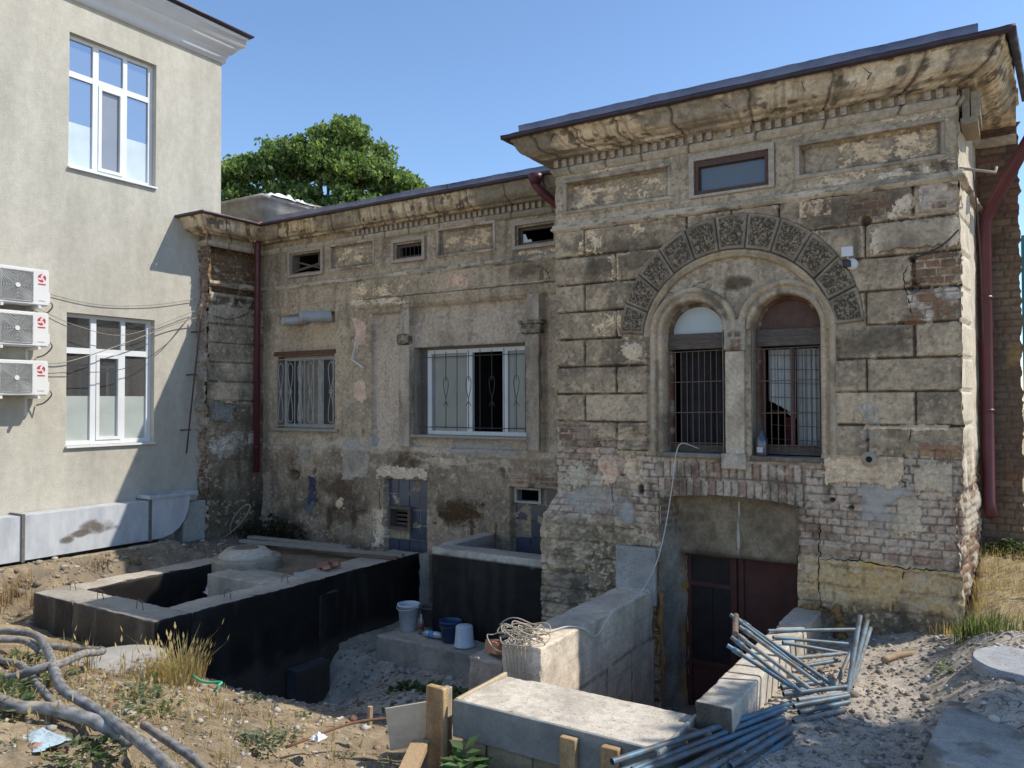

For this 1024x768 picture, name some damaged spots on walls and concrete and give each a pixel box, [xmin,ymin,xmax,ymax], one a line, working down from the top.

peeling [571,166,668,210]
peeling [799,108,962,226]
spalling [904,248,963,329]
spalling [193,235,254,538]
spalling [558,421,651,449]
crack [817,514,957,606]